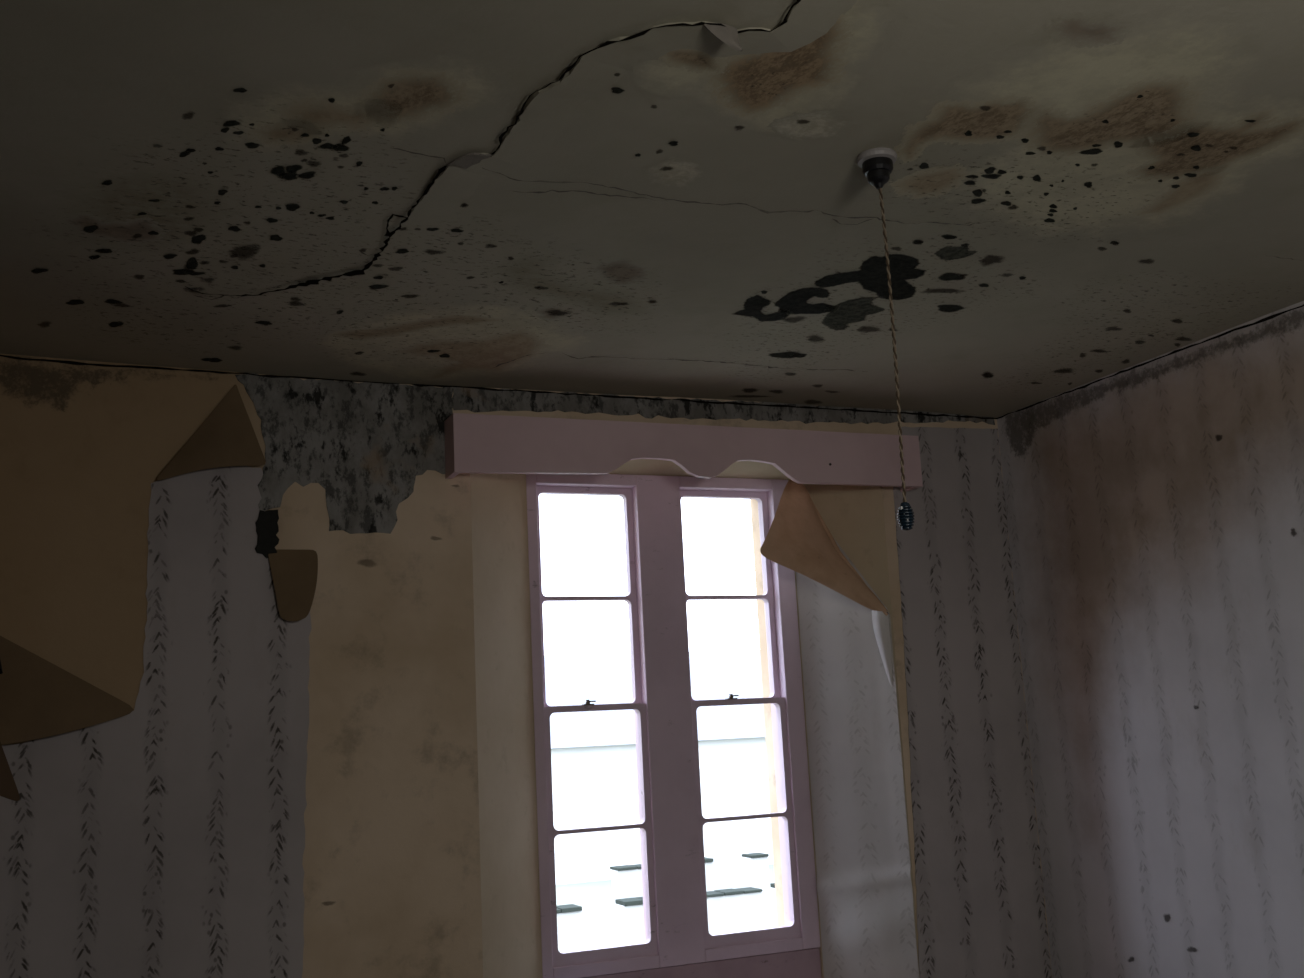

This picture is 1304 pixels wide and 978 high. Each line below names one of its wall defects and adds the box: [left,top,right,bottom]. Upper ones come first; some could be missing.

damp [34,120,397,362]
crack [185,0,857,300]
damp [735,234,1026,398]
damp [908,130,1130,231]
damp [1148,132,1237,188]